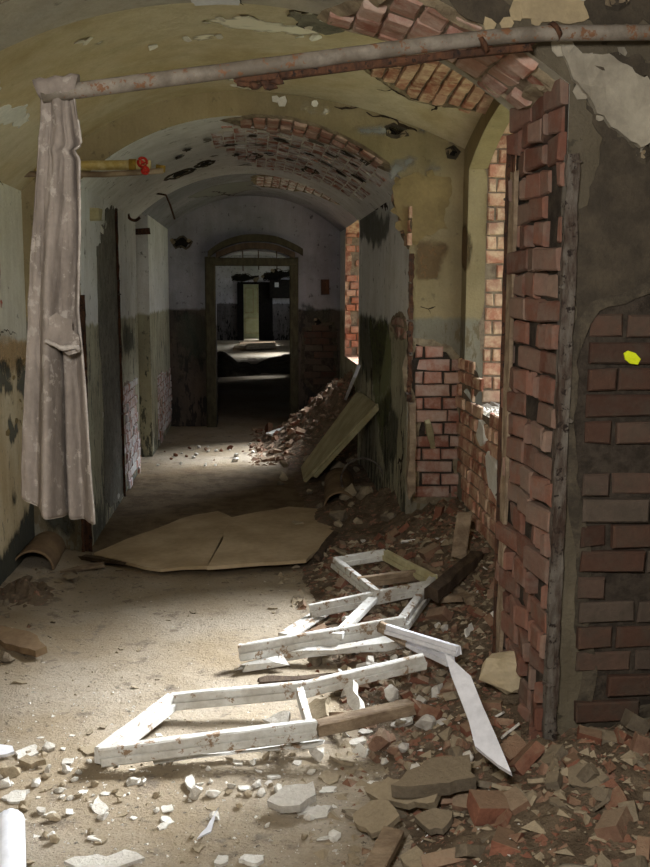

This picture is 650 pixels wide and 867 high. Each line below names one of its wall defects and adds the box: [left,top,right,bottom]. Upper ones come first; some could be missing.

peeling [0,104,30,128]
flaking render [164,96,452,250]
rust [233,42,535,83]
flaking render [183,0,650,42]
spalling [96,204,141,508]
water stain [360,313,398,471]
flaking render [364,41,650,740]